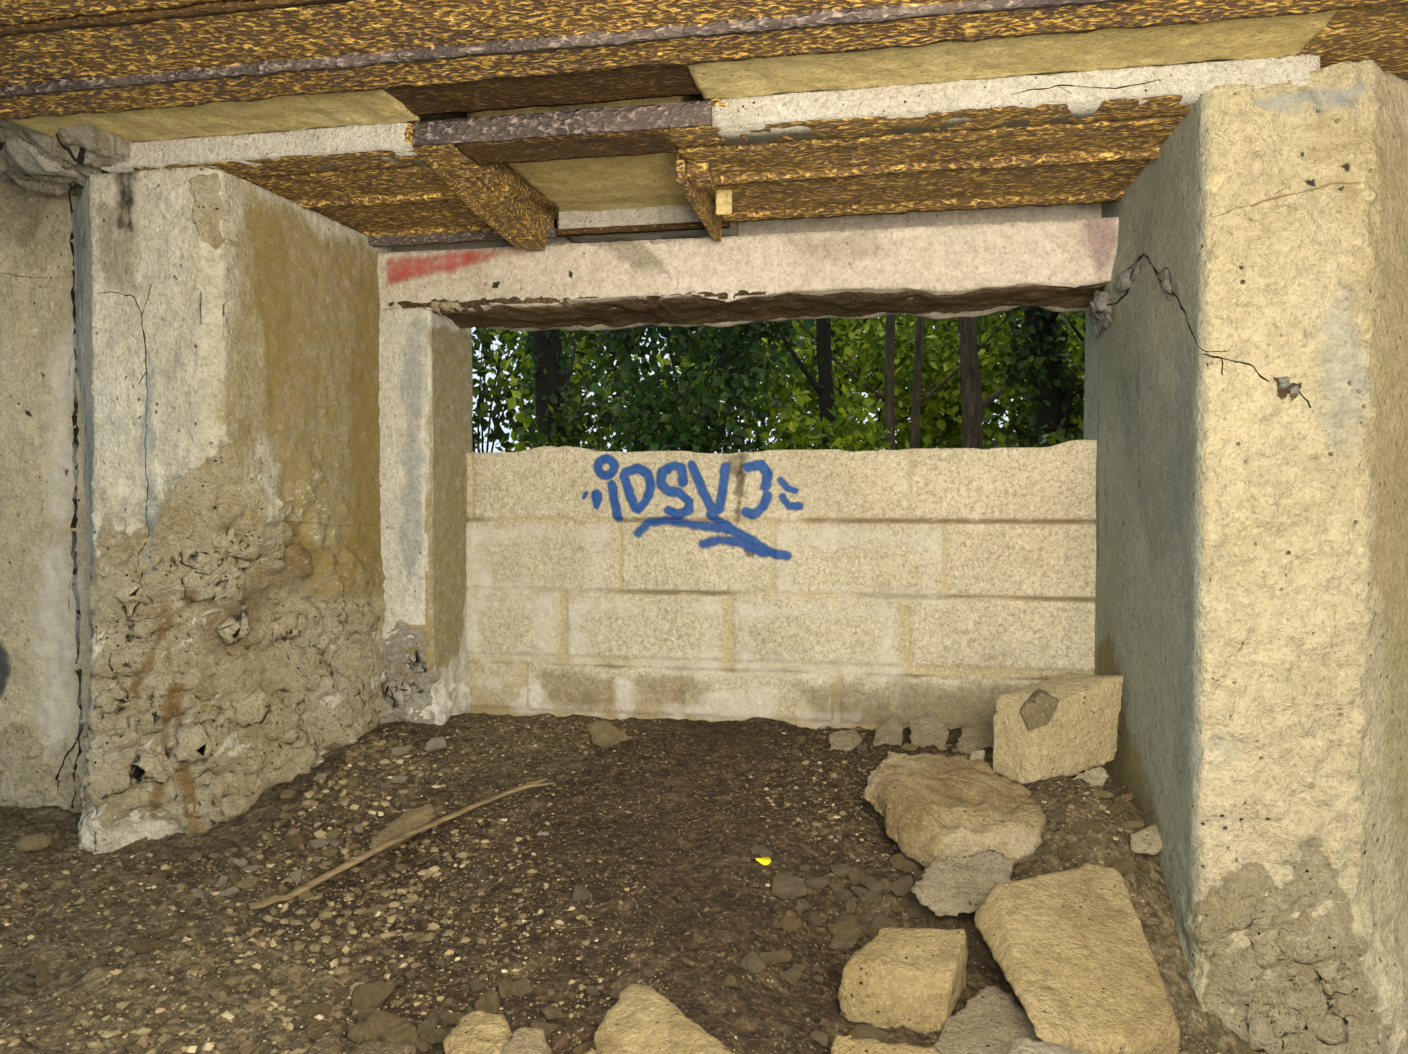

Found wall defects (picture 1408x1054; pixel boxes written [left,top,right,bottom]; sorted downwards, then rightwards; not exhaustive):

spalling [0,119,131,199]
crack [1094,253,1314,413]
crack [0,127,154,809]
spalling [0,416,442,835]
spalling [1190,839,1393,1054]